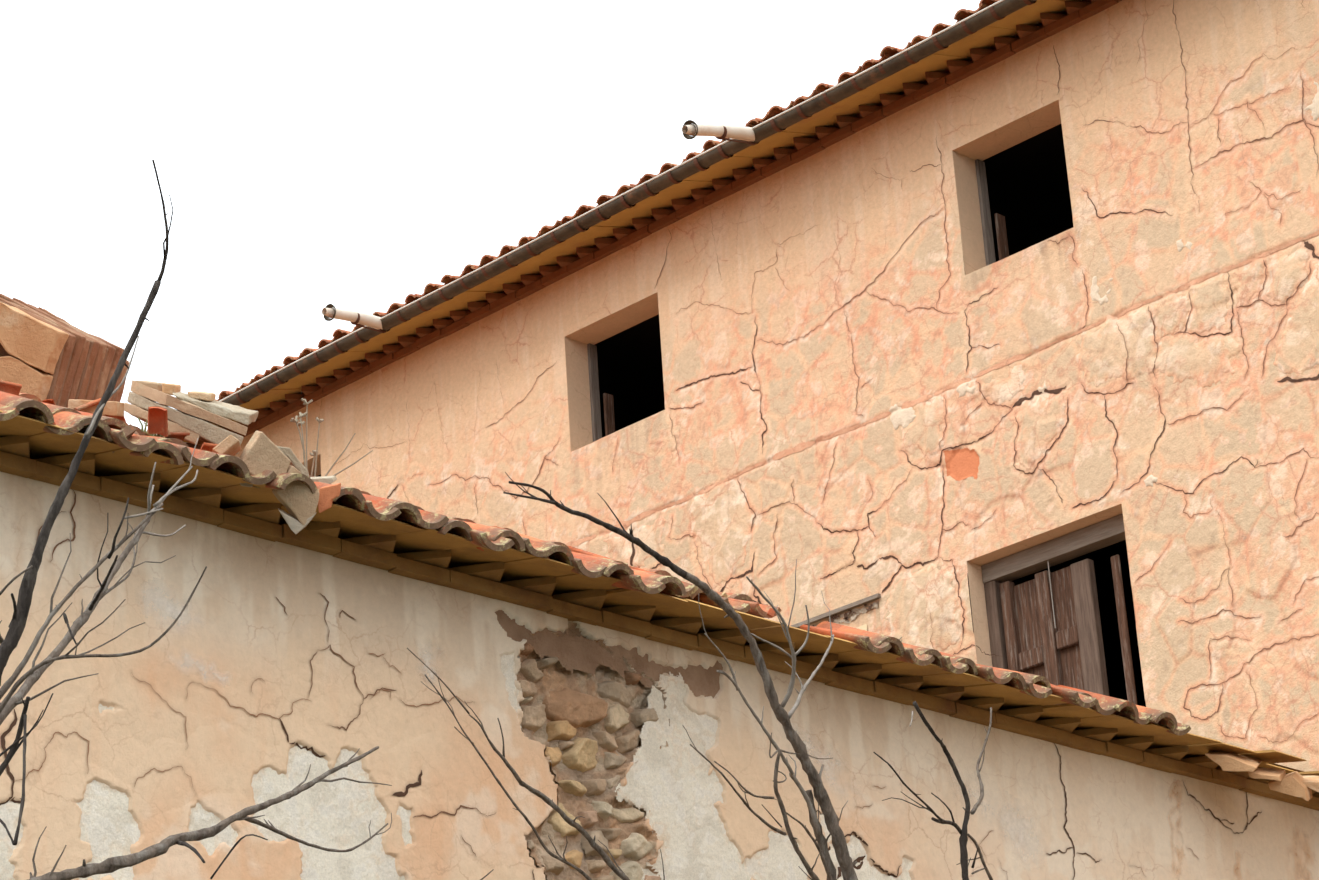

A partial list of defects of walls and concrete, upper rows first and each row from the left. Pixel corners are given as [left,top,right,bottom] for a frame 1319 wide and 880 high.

crack [630,0,1319,743]
crack [133,594,470,787]
crack [0,709,90,805]
spalling [495,610,808,880]
peeling [0,801,24,880]
peeling [77,780,140,880]
peeling [189,802,238,856]
peeling [250,745,412,880]
crack [392,770,493,855]
crack [828,786,901,879]
peeling [819,813,913,880]
crack [1047,743,1100,879]